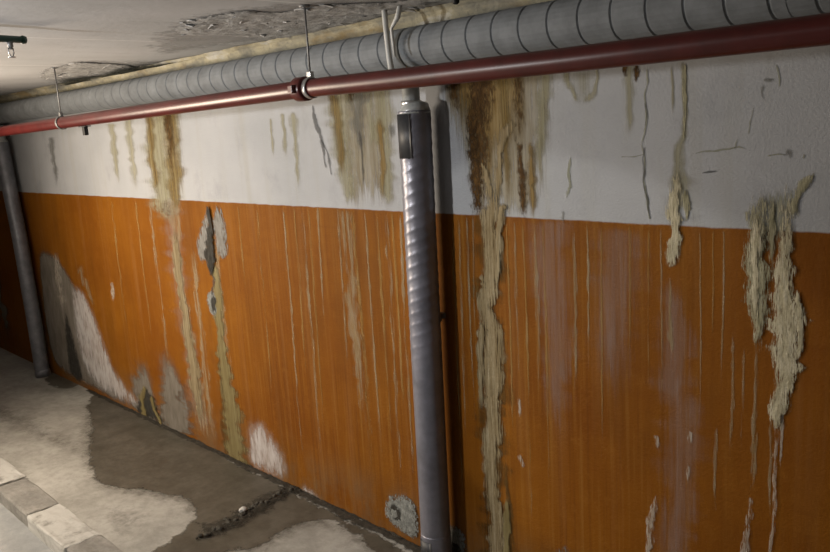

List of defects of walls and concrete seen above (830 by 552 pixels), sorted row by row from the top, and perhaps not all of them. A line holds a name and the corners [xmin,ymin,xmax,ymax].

peeling [40,62,158,81]
damp [146,114,183,217]
peeling [159,0,443,53]
damp [328,90,392,201]
crack [622,69,650,219]
damp [665,64,690,266]
spalling [196,206,228,276]
peeling [40,253,194,435]
damp [86,266,421,552]
damp [473,191,513,552]
damp [742,173,814,552]
spalling [385,494,419,539]